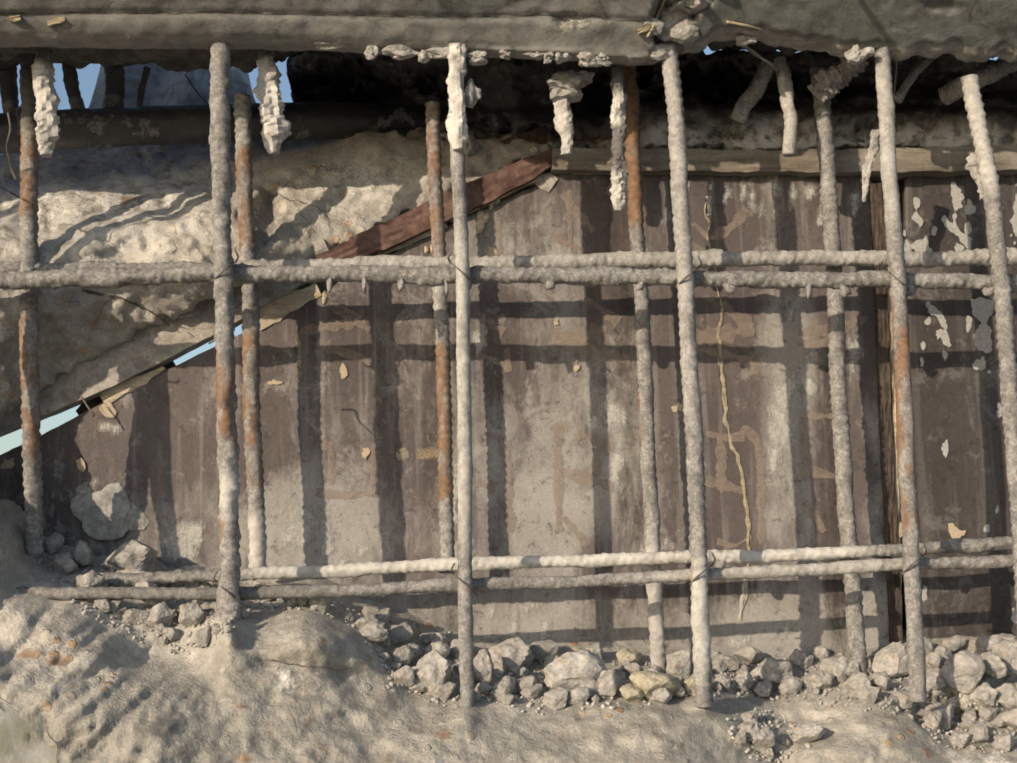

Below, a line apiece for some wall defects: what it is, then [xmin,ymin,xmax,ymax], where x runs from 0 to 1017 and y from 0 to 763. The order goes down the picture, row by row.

crack [82,289,196,333]
spalling [0,41,475,707]
crack [0,0,710,45]
spalling [233,39,1017,707]